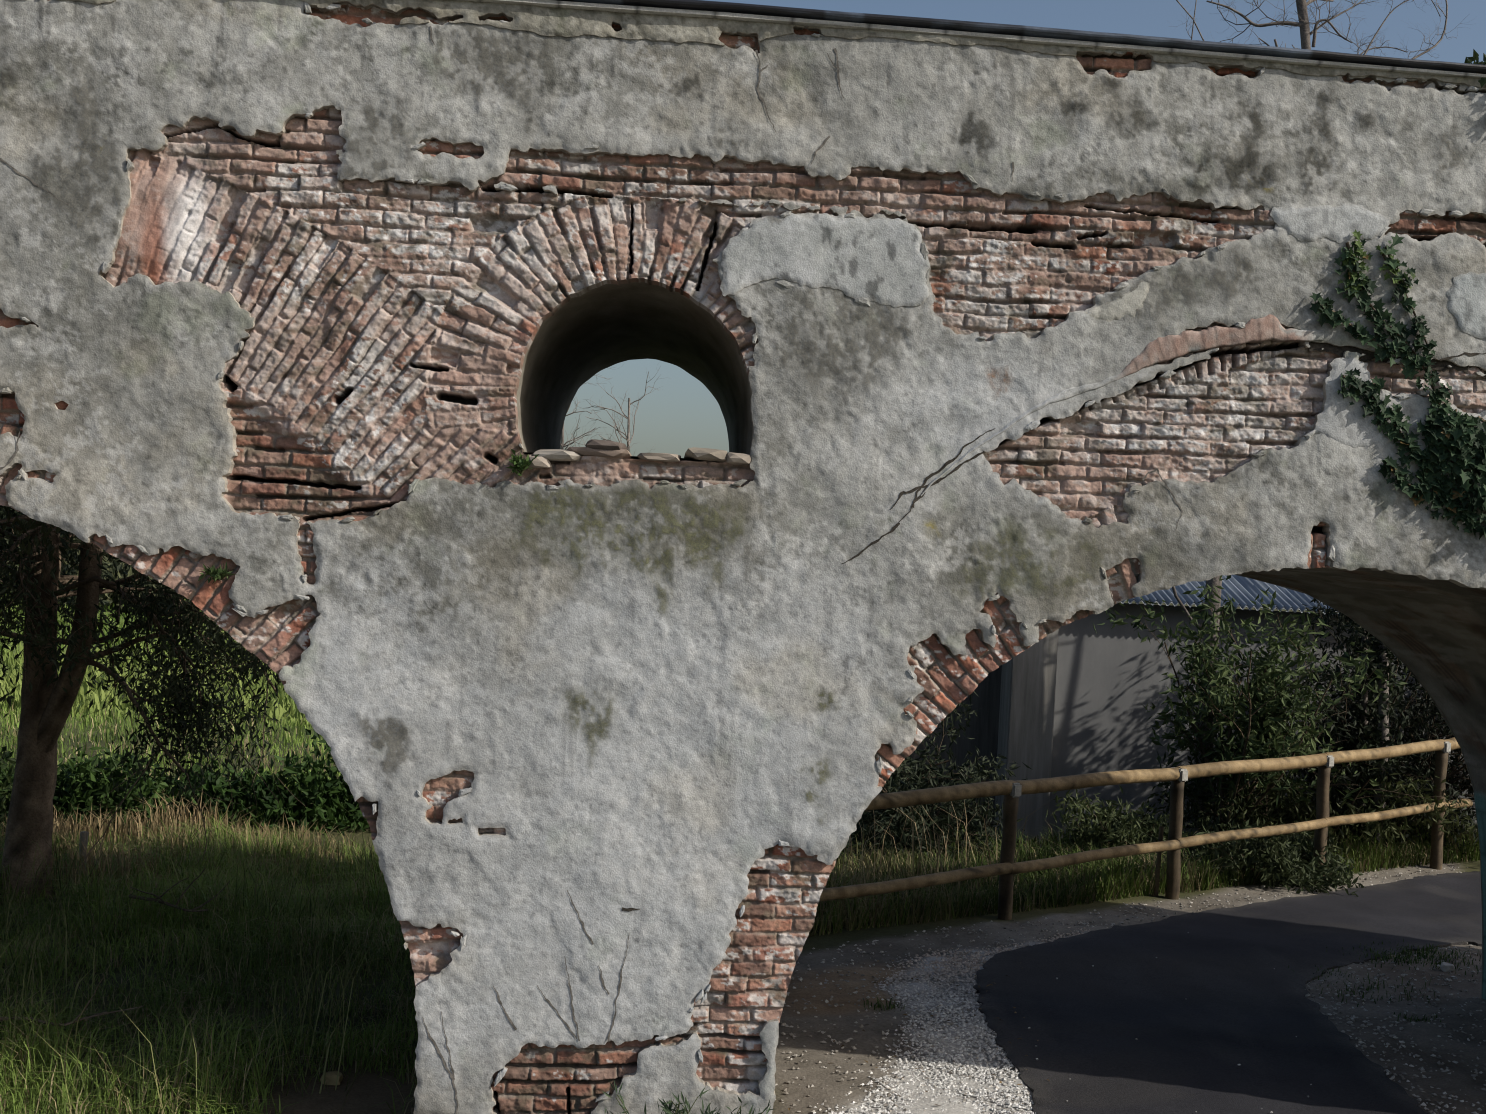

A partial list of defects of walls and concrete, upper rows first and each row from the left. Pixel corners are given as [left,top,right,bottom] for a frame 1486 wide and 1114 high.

spalling [304,2,461,27]
spalling [1076,49,1152,78]
spalling [1378,209,1486,247]
spalling [91,107,1274,686]
spalling [983,322,1486,528]
spalling [0,464,56,512]
crack [842,428,995,564]
crack [1142,468,1183,532]
spalling [874,593,1093,787]
spalling [417,770,474,823]
spalling [399,920,467,988]
spalling [491,840,836,1114]